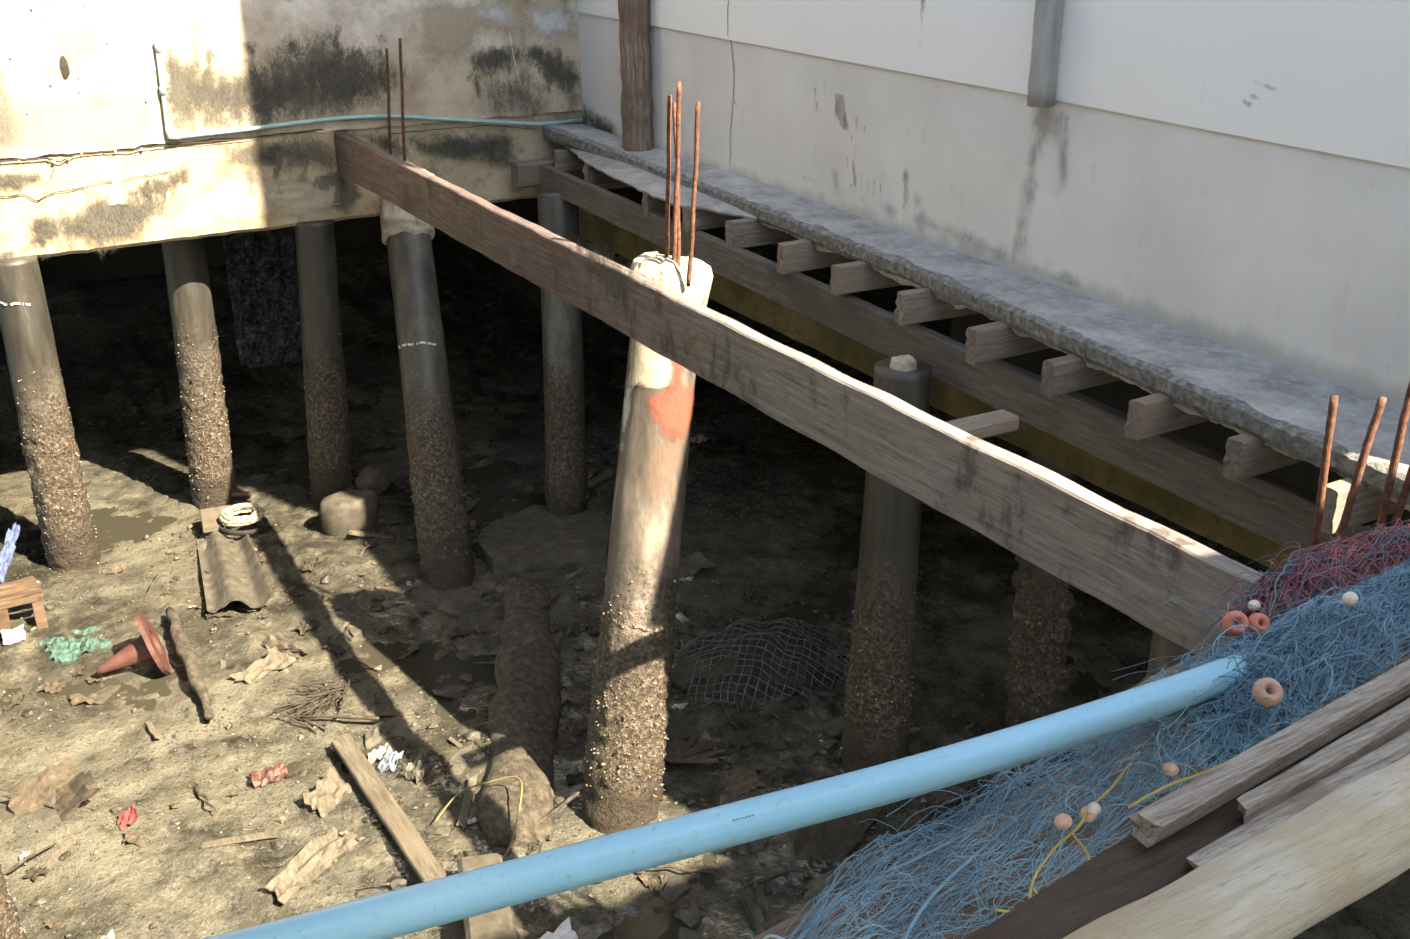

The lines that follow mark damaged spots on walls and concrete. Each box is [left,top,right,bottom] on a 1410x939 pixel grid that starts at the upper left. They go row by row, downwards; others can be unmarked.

water stain [29,158,189,251]
crack [0,129,323,208]
water stain [156,24,404,194]
mould [347,45,614,166]
crack [727,0,736,157]